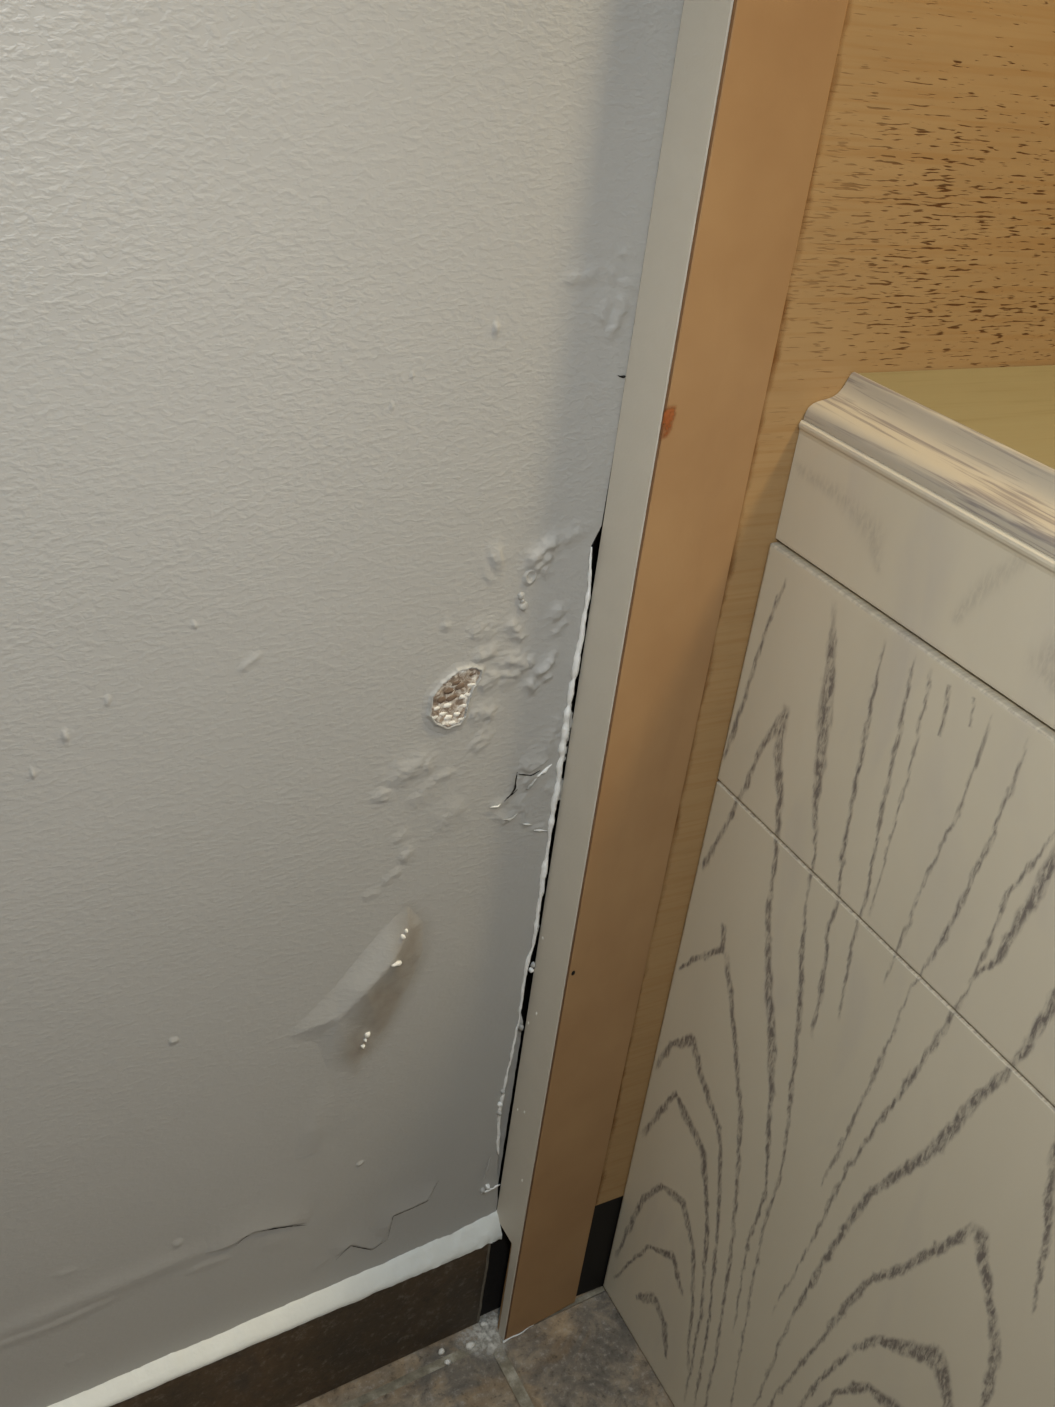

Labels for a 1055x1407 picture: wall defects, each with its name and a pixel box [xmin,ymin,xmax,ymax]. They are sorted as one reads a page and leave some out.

flaking render [421,660,487,735]
crack [480,547,592,1194]